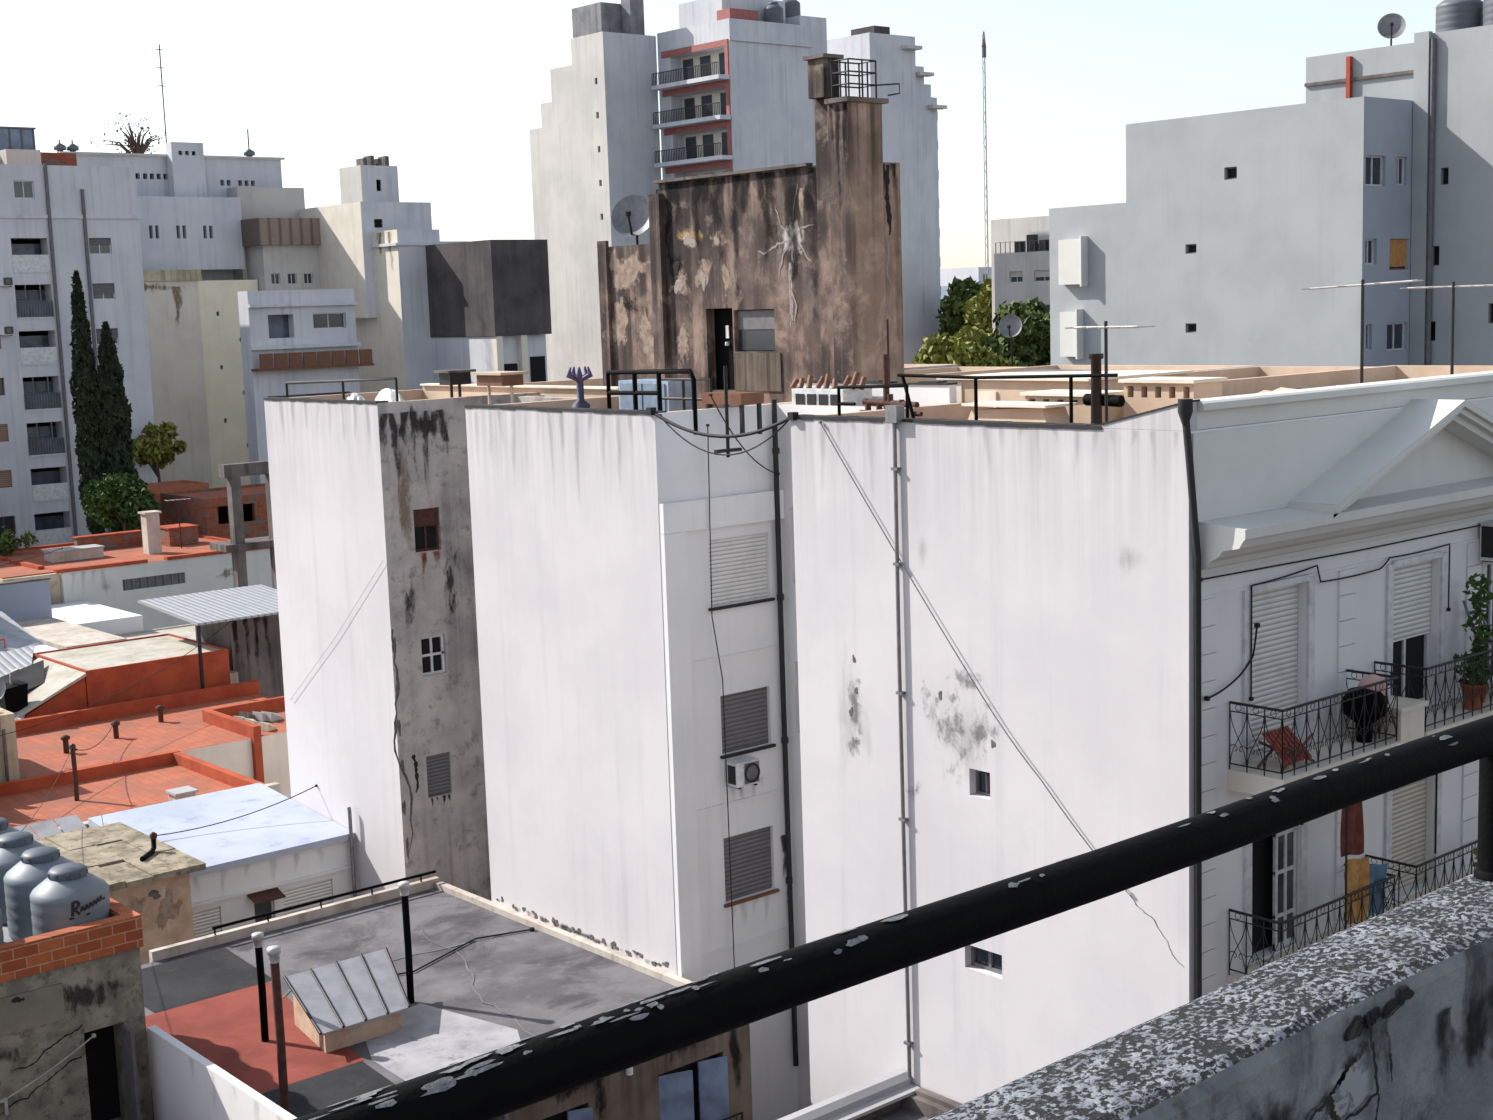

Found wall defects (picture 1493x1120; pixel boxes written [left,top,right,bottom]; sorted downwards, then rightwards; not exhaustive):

flaking render [669,229,732,295]
damp [665,167,818,319]
flaking render [609,247,655,369]
damp [379,407,449,532]
damp [444,554,455,612]
peeling [496,896,669,967]
peeling [834,928,868,954]
damp [64,981,117,1012]
peeling [309,1084,398,1120]
peeling [421,972,720,1097]
crack [1309,1009,1393,1120]
damp [1438,989,1493,1070]